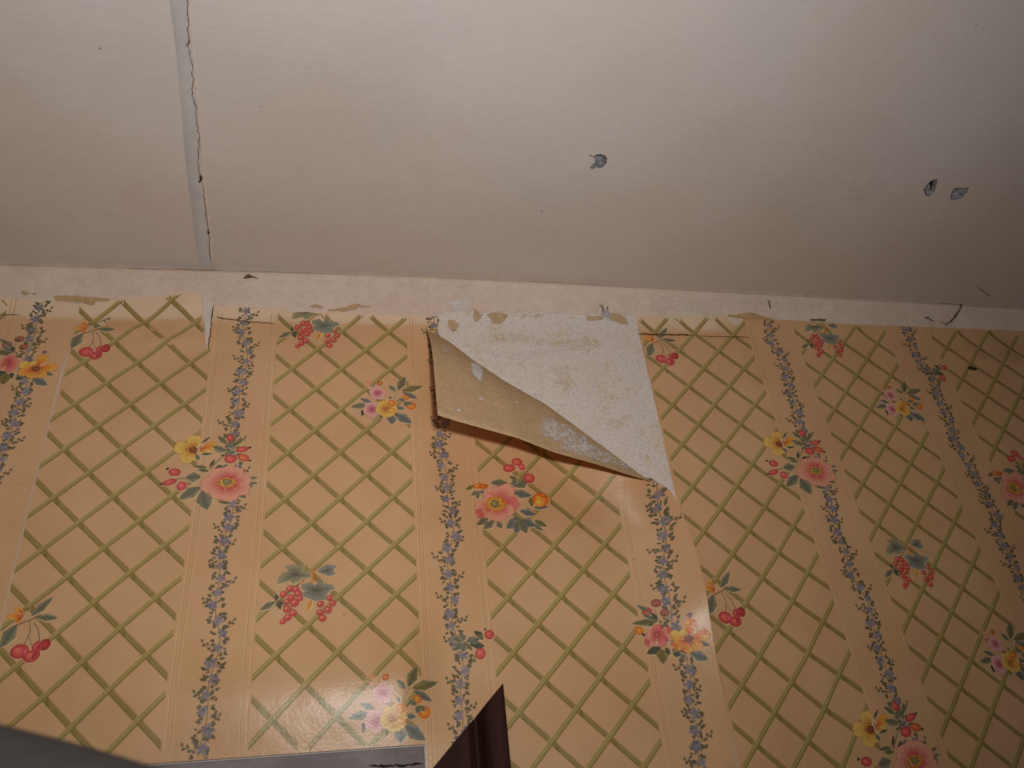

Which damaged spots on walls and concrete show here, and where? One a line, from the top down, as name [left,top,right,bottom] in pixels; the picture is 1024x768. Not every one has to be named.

crack [185,0,214,270]
spalling [590,154,607,169]
spalling [923,179,938,197]
spalling [950,187,969,200]
flaking render [426,297,676,499]